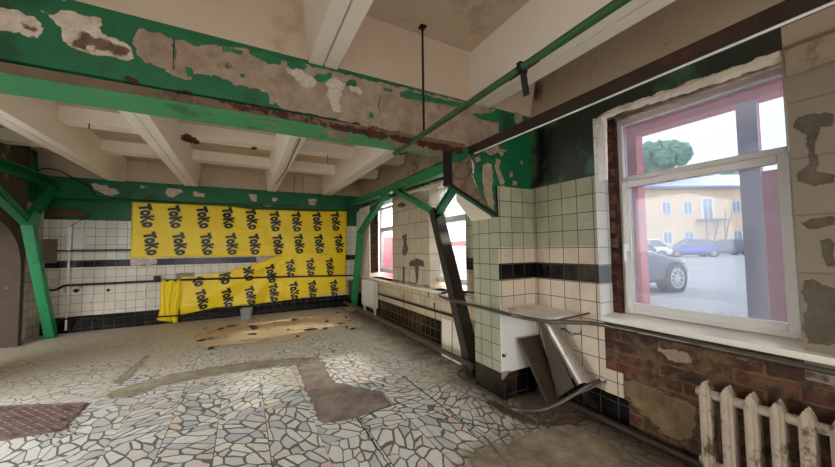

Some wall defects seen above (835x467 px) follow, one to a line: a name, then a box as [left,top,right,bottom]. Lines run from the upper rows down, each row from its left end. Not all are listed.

peeling [0,7,517,211]
rust [212,97,463,154]
flaking render [658,346,692,363]
flaking render [624,379,698,441]